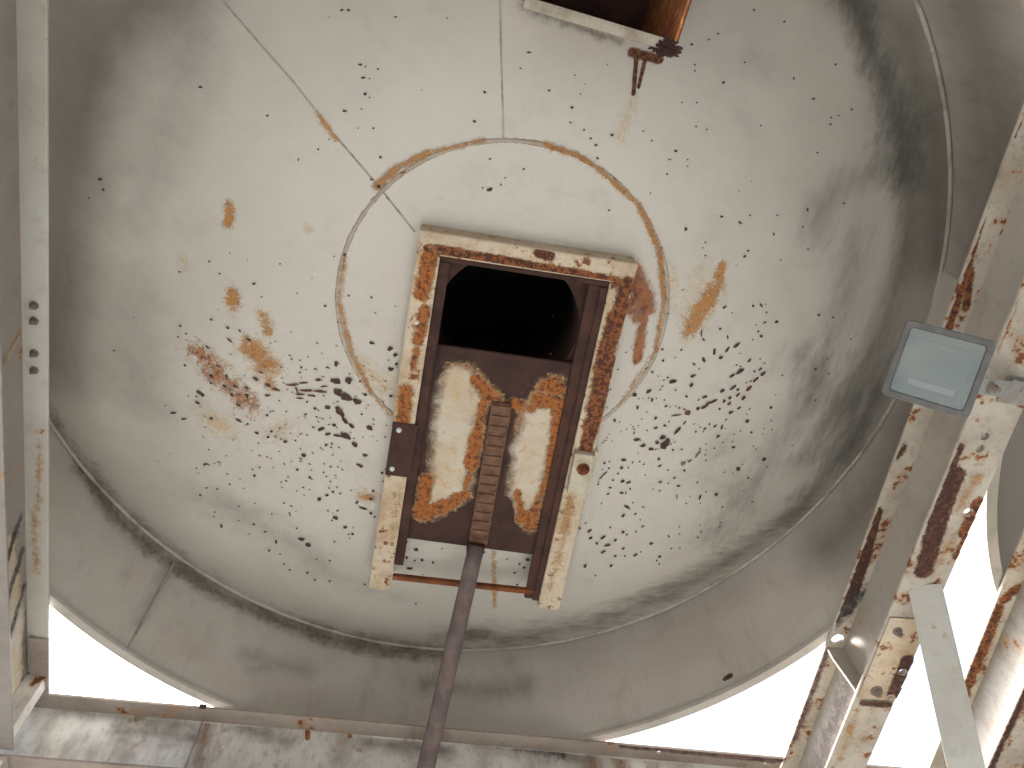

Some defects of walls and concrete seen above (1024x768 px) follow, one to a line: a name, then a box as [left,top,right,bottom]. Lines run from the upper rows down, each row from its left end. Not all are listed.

rust [627,34,684,96]
rust [222,200,235,228]
rust [182,310,281,420]
rust [223,287,241,312]
rust [337,257,415,424]
rust [410,141,668,452]
rust [681,261,726,339]
rust [945,208,989,330]
rust [550,494,574,589]
rust [840,507,883,615]
rust [913,443,984,579]
rust [965,584,1021,697]